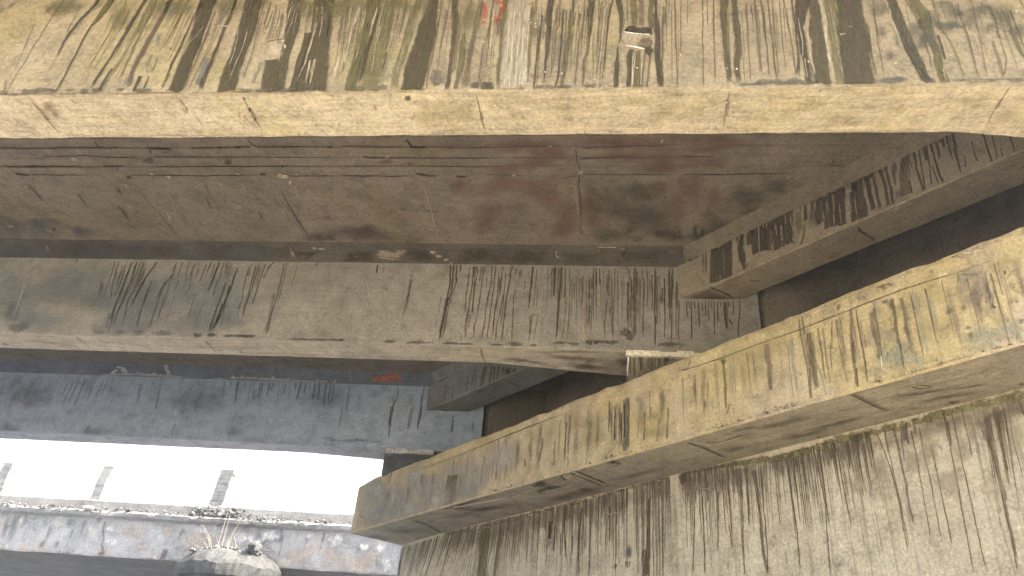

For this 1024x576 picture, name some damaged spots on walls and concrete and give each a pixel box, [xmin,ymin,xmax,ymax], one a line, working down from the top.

water stain [58,0,688,92]
crack [555,139,583,233]
water stain [685,133,1015,283]
water stain [100,248,318,349]
water stain [432,230,740,369]
water stain [398,398,1024,576]